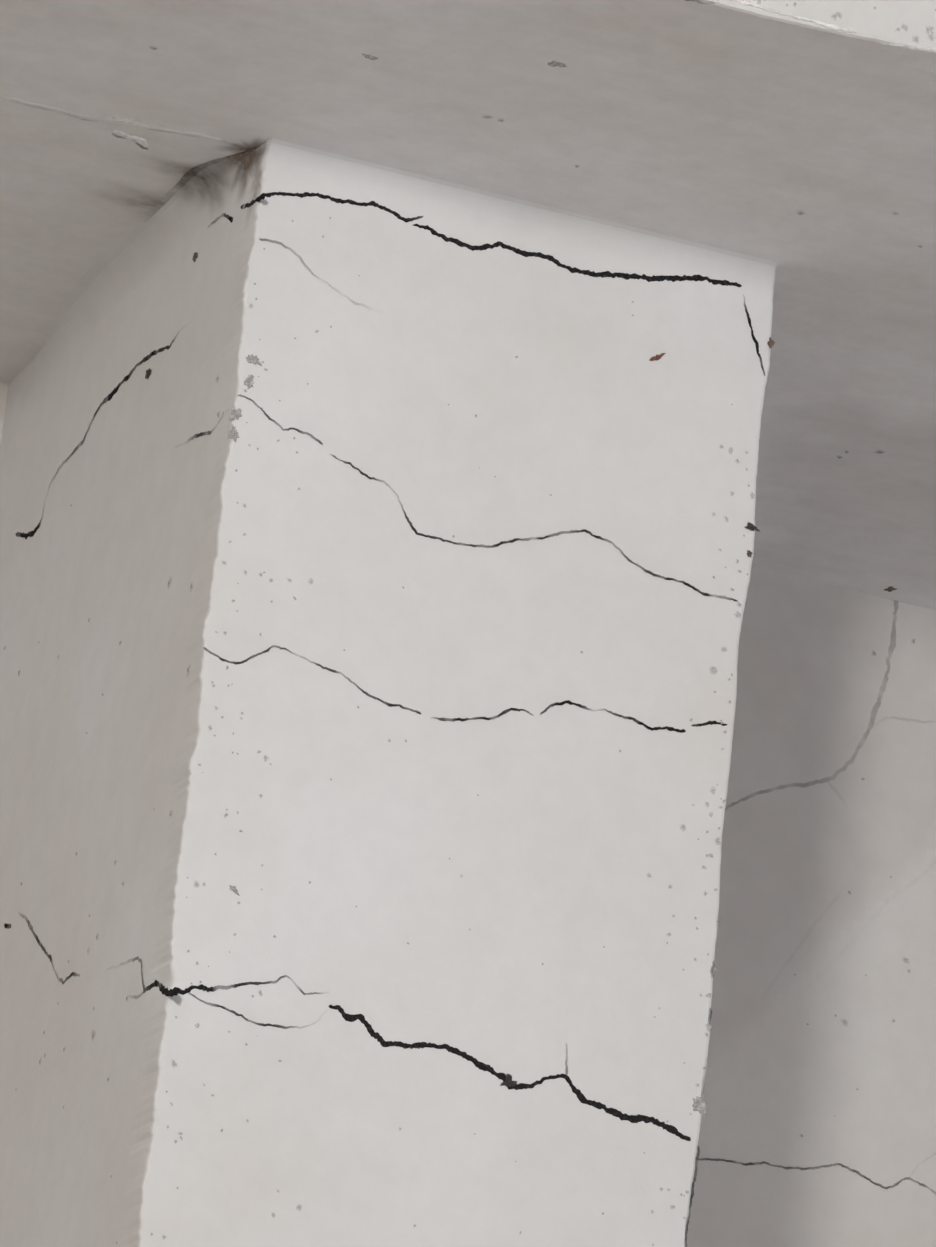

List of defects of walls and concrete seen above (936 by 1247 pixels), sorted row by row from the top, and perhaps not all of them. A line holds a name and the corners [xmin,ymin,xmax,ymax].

crack [223,192,765,376]
crack [72,344,172,455]
crack [246,397,376,480]
crack [16,522,41,539]
crack [403,511,738,602]
crack [204,646,727,733]
crack [4,920,75,984]
crack [143,975,691,1141]
crack [685,1159,808,1242]
crack [839,1163,890,1189]